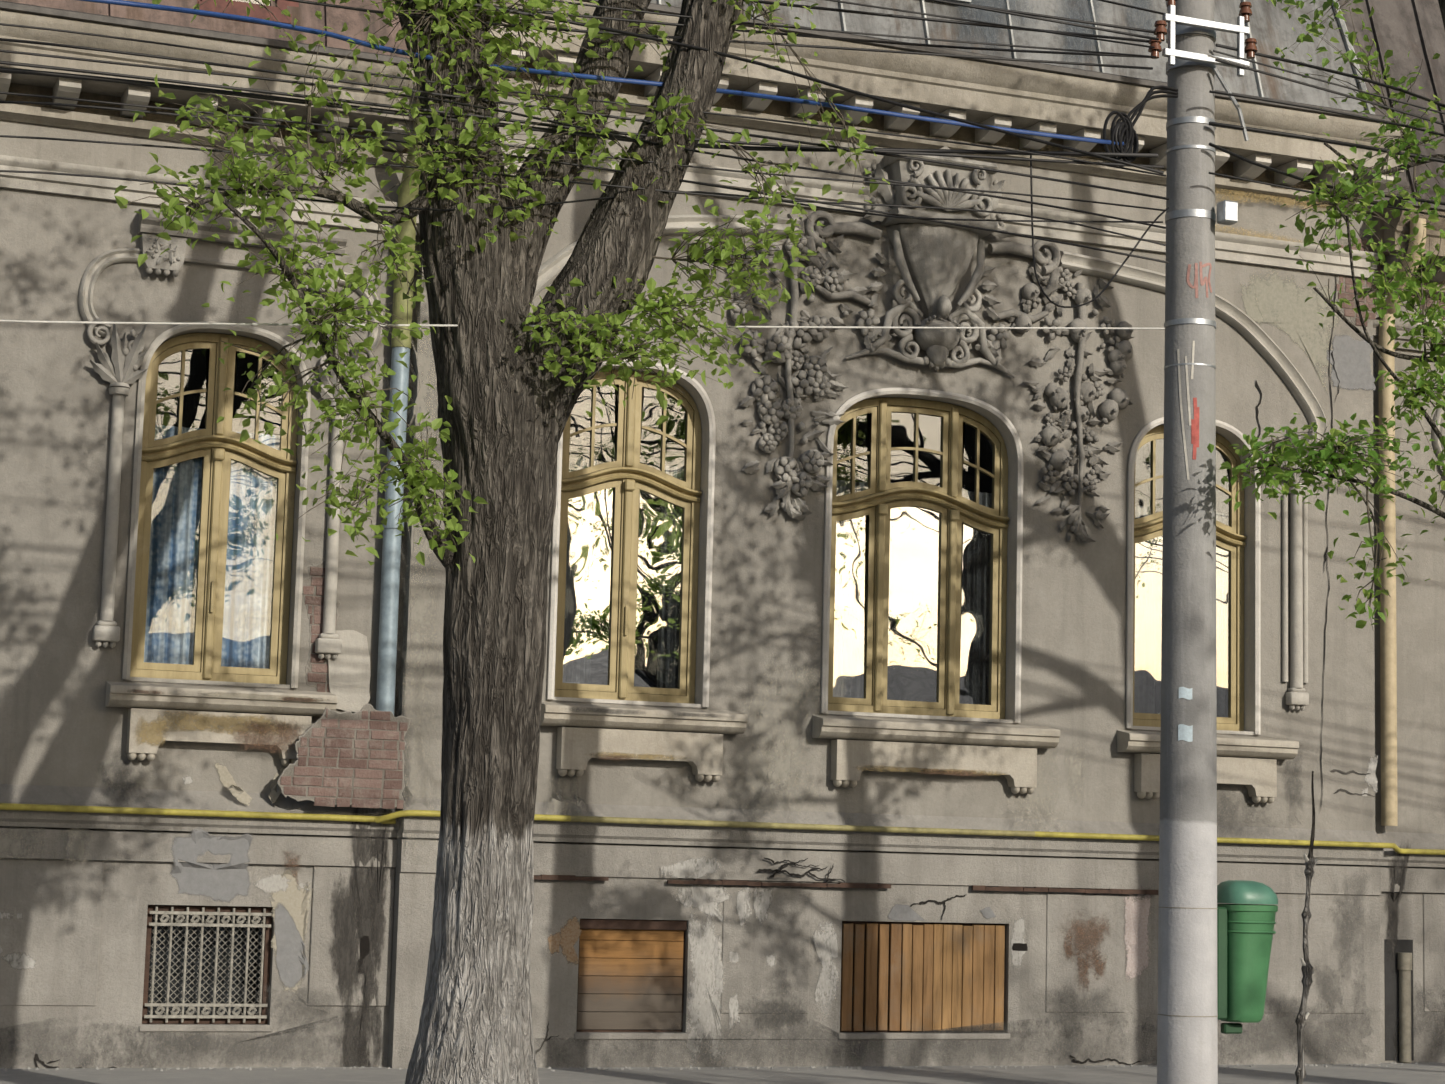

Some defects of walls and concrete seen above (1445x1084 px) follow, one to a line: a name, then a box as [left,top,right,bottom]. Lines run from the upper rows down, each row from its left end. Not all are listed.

flaking render [255,869,313,991]
damp [331,808,390,1067]
spalling [548,916,581,965]
flaking render [661,856,773,1060]
crack [757,858,845,889]
spalling [813,922,838,1012]
crack [910,894,967,920]
damp [134,995,326,1067]